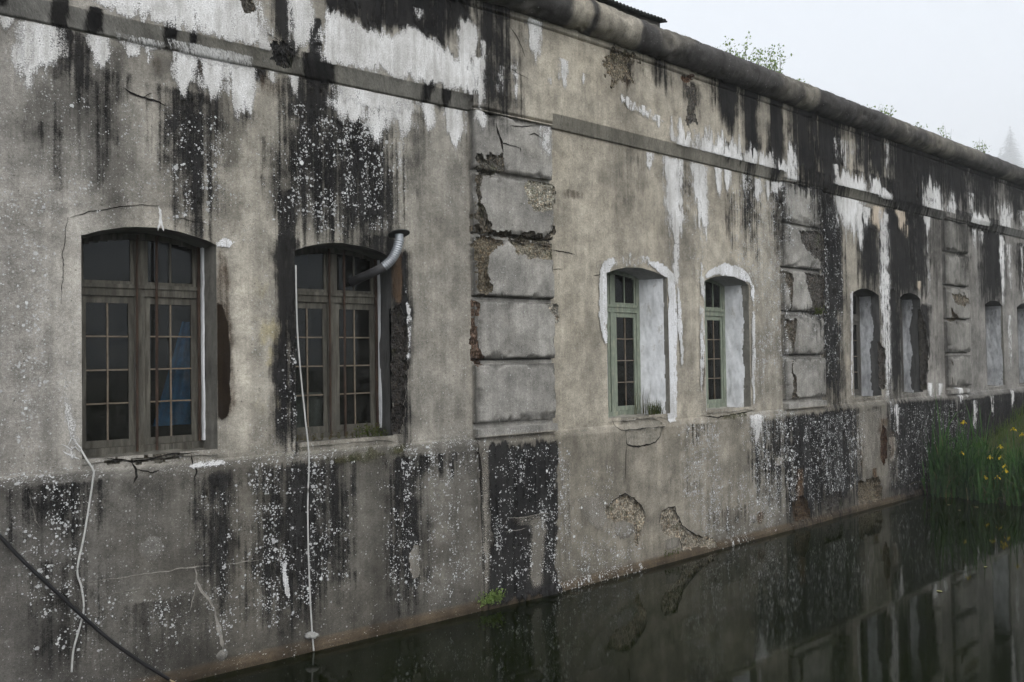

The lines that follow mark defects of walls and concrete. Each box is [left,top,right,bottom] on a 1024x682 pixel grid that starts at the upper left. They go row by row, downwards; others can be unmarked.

crack [123,87,164,105]
leakage [524,17,543,61]
spalling [602,46,636,87]
spalling [681,73,698,126]
crack [61,204,205,291]
leakage [0,0,525,634]
spalling [469,152,556,367]
leakage [621,58,1024,526]
crack [107,452,198,484]
leakage [475,438,634,610]
crack [607,423,702,548]
spalling [660,508,717,551]